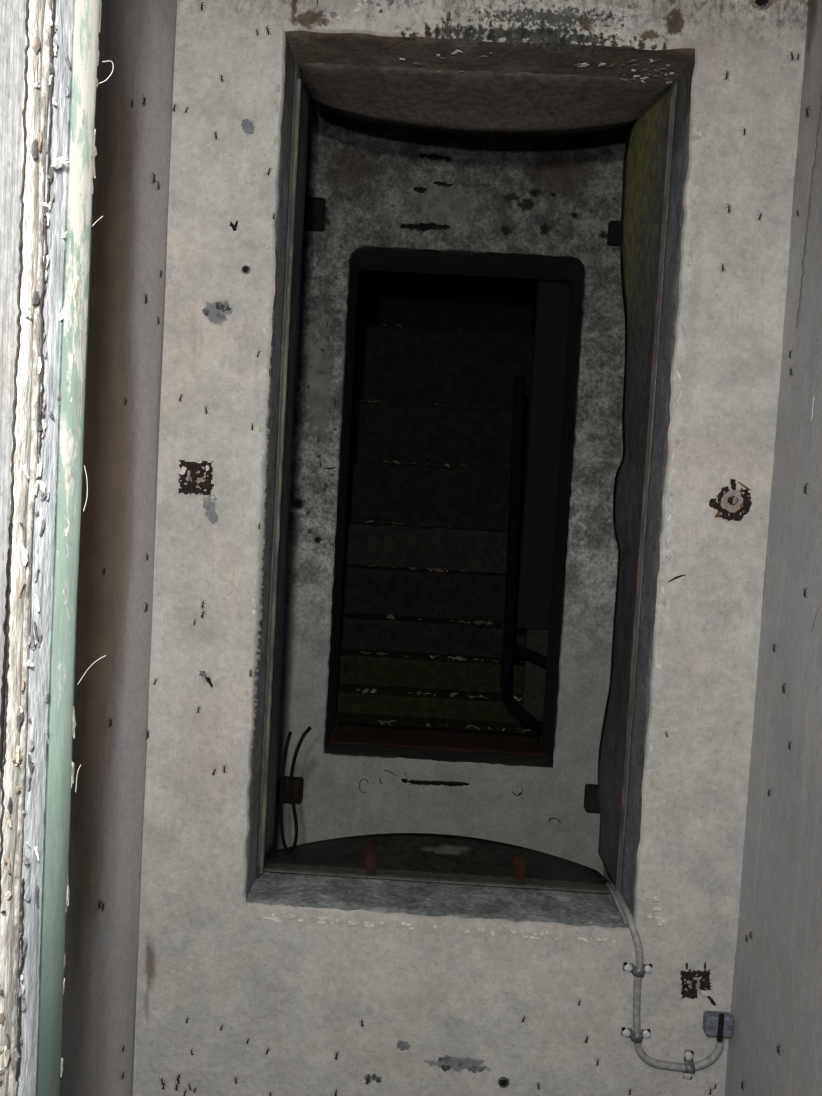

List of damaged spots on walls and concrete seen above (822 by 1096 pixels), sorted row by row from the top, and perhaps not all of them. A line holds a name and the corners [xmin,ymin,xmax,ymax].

peeling [330,0,409,20]
corrosion [709,479,752,521]